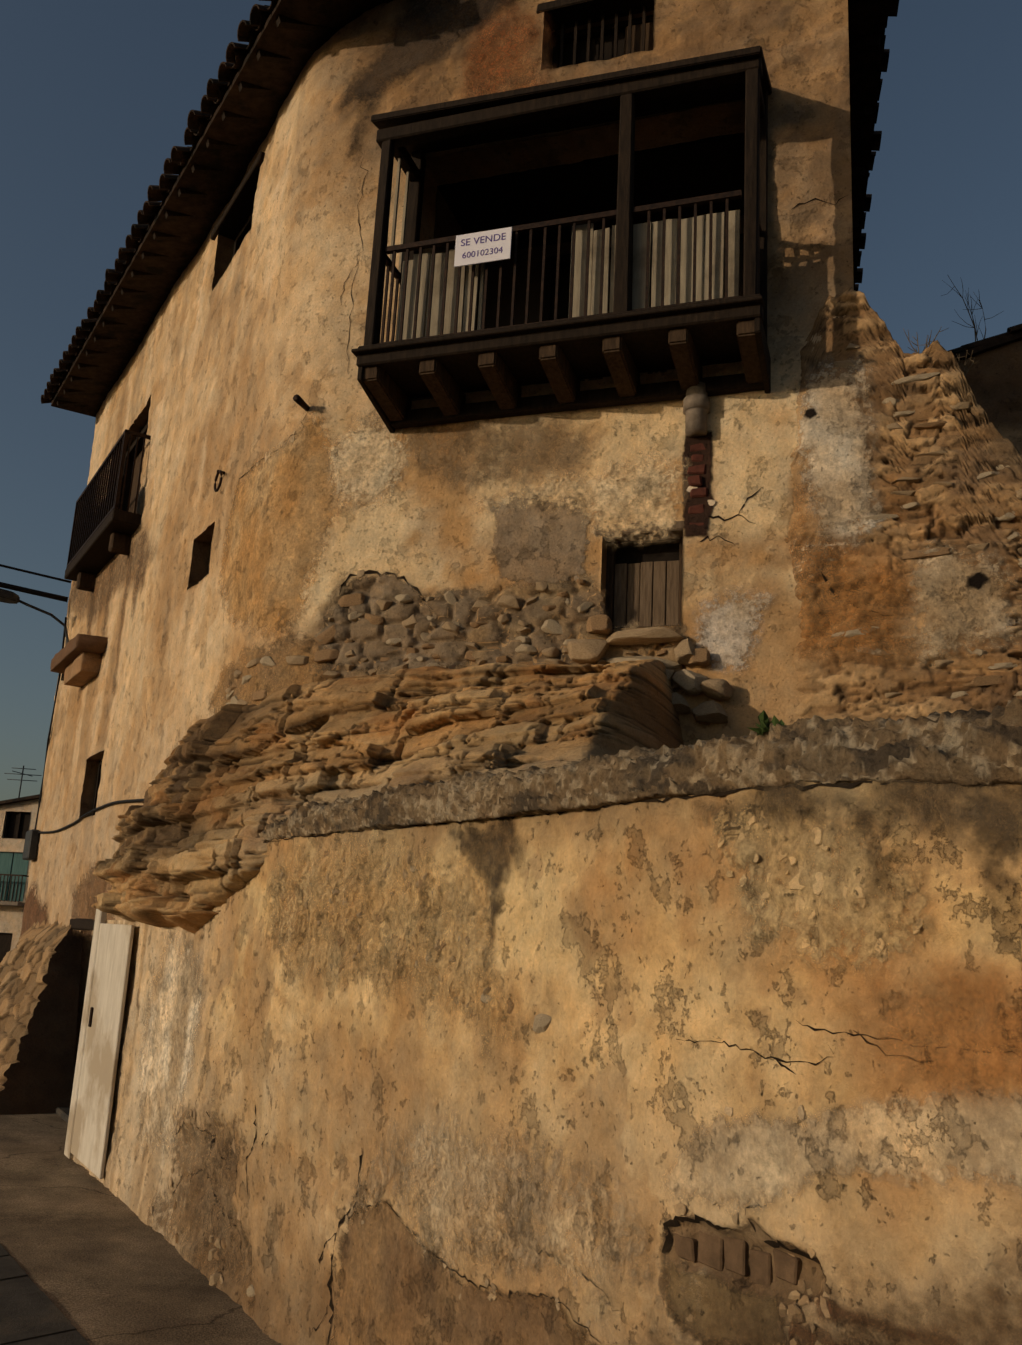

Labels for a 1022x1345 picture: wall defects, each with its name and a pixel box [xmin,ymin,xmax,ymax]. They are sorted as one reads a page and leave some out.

water stain [340,0,514,147]
crack [792,196,845,209]
crack [700,488,761,545]
spalling [339,570,433,610]
water stain [787,515,914,665]
water stain [703,780,844,836]
water stain [856,779,1022,912]
crack [677,1020,1019,1074]
crack [312,1155,368,1345]
crack [479,1223,618,1311]
spalling [655,1203,837,1345]
water stain [731,1287,1022,1345]